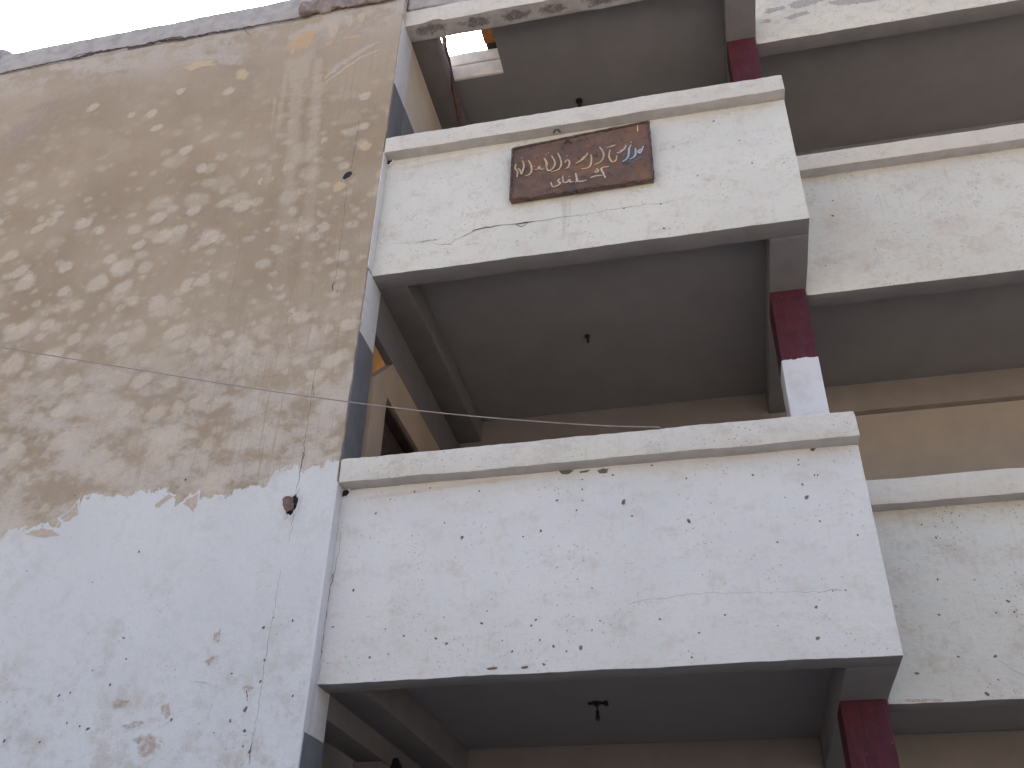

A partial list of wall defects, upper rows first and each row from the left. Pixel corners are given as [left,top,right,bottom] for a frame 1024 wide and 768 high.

peeling [19,495,80,539]
peeling [152,490,200,515]